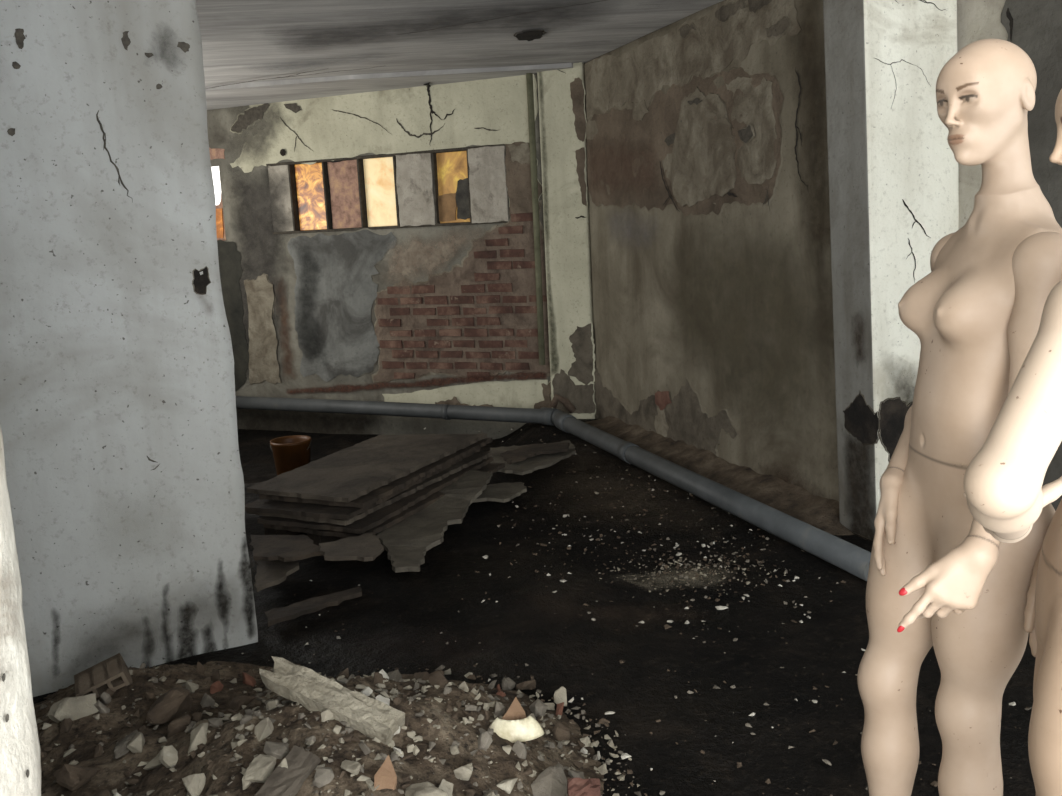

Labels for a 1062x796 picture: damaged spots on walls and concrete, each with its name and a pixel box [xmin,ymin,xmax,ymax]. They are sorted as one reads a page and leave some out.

crack [96,110,133,203]
crack [334,87,455,145]
crack [875,58,930,108]
peeling [1001,0,1062,228]
spalling [192,240,249,392]
damp [299,253,318,357]
flaking render [230,74,738,457]
crack [902,199,929,283]
spalling [843,391,913,462]
damp [112,605,215,668]
damp [217,582,229,619]
damp [241,542,254,635]